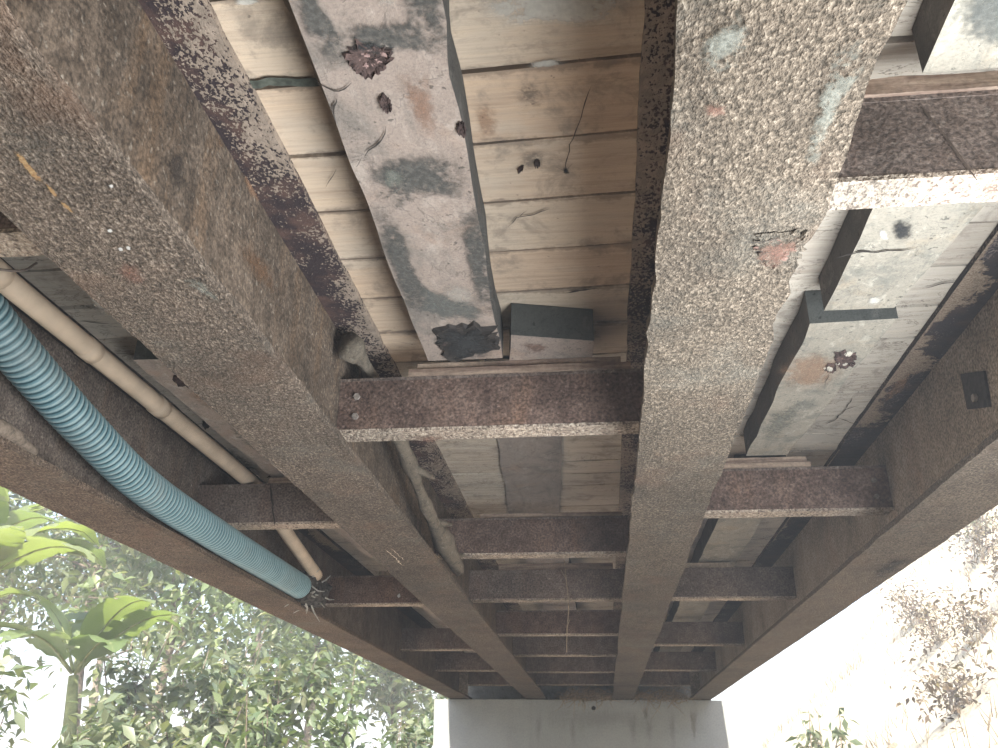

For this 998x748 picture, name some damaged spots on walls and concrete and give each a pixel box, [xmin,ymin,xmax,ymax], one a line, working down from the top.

leakage [968,0,998,41]
spalling [342,38,394,80]
leakage [374,159,456,202]
spalling [823,349,857,374]